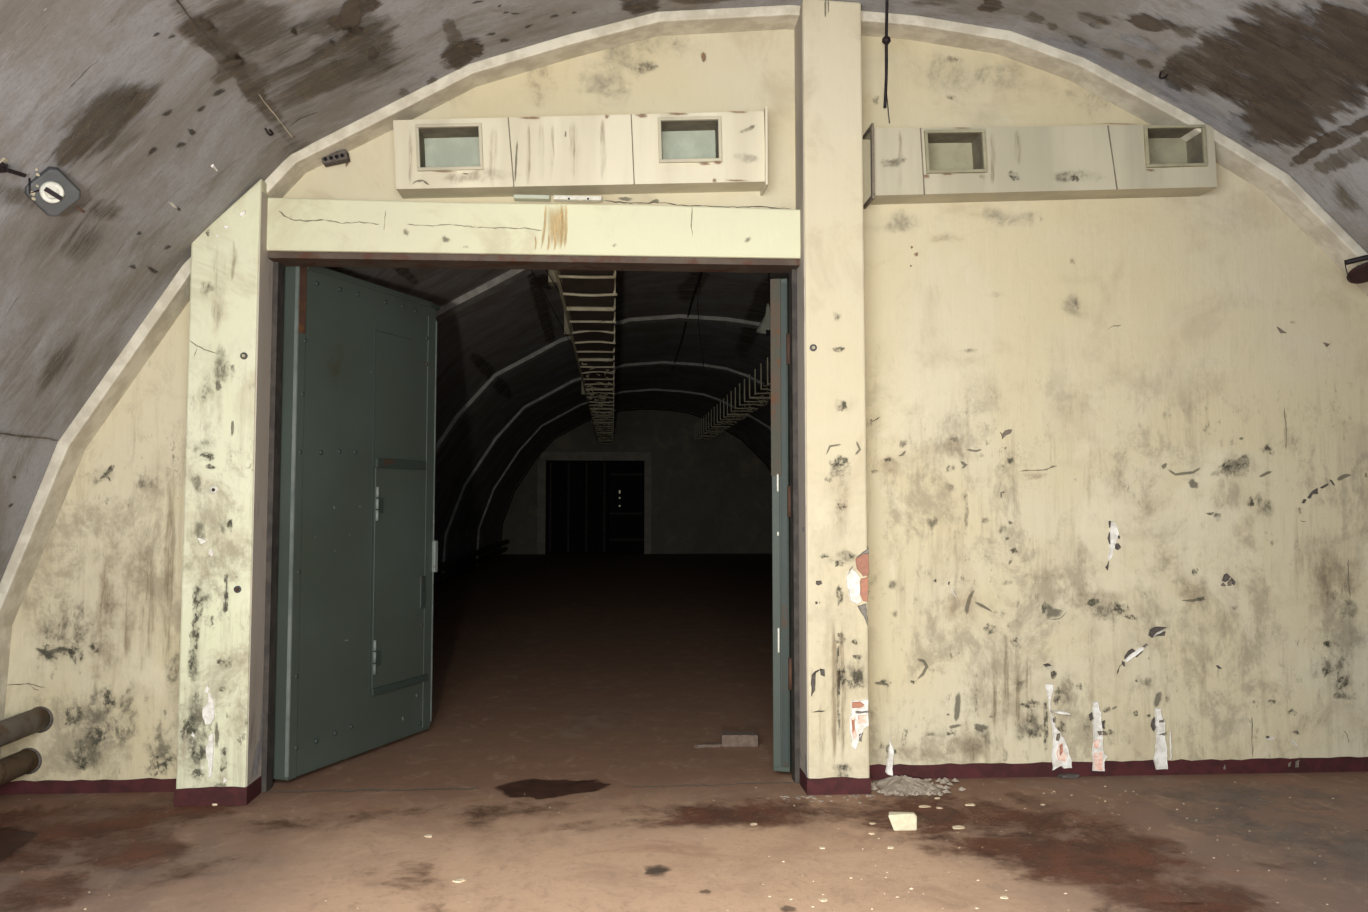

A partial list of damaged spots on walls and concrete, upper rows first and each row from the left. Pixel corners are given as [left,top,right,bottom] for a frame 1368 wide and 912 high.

damp [179,0,405,131]
damp [428,20,483,85]
damp [1103,3,1368,208]
corrosion [535,208,567,249]
spalling [846,548,869,626]
damp [169,576,228,681]
peeling [1117,626,1167,674]
damp [181,708,227,786]
spalling [849,699,869,750]
spalling [1043,663,1072,771]
spalling [1089,701,1117,771]
spalling [1148,692,1172,770]